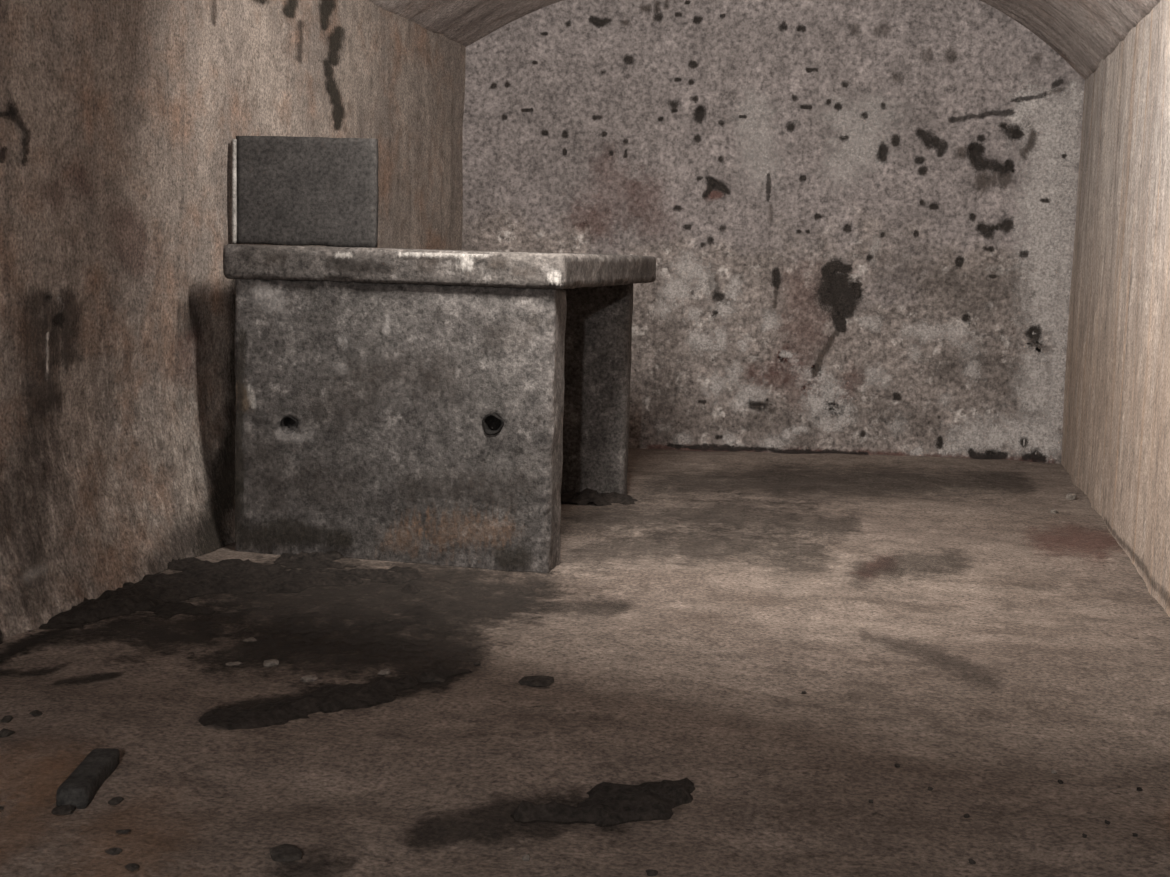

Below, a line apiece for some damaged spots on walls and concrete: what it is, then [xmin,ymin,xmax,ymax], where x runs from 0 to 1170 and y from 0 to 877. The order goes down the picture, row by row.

water stain [283,0,303,62]
water stain [320,0,345,130]
crack [0,102,30,166]
water stain [0,286,564,710]
water stain [405,792,624,848]